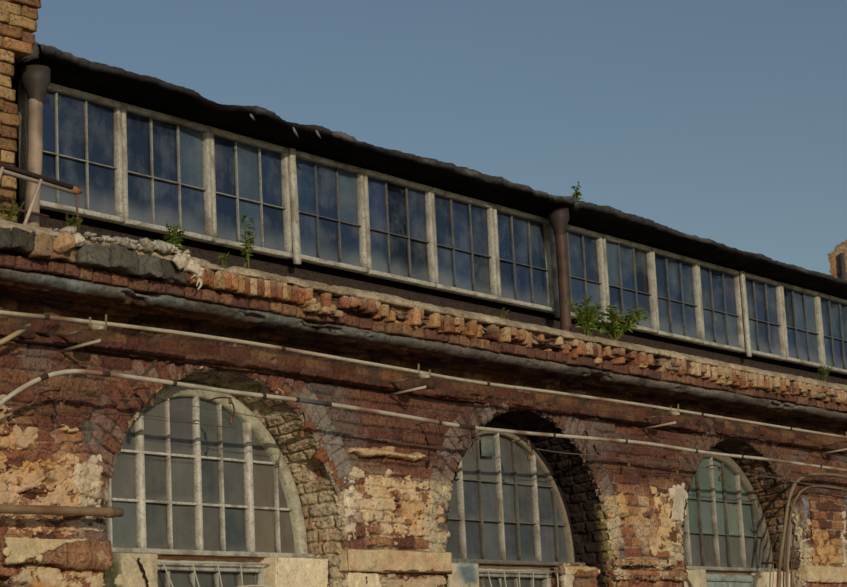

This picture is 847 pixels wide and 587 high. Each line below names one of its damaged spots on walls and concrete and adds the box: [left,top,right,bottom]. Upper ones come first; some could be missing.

flaking render [0,394,158,587]
flaking render [270,381,451,549]
flaking render [604,492,629,521]
flaking render [642,483,688,557]
flaking render [798,511,847,567]
crack [137,558,149,587]
flaking render [558,563,600,587]